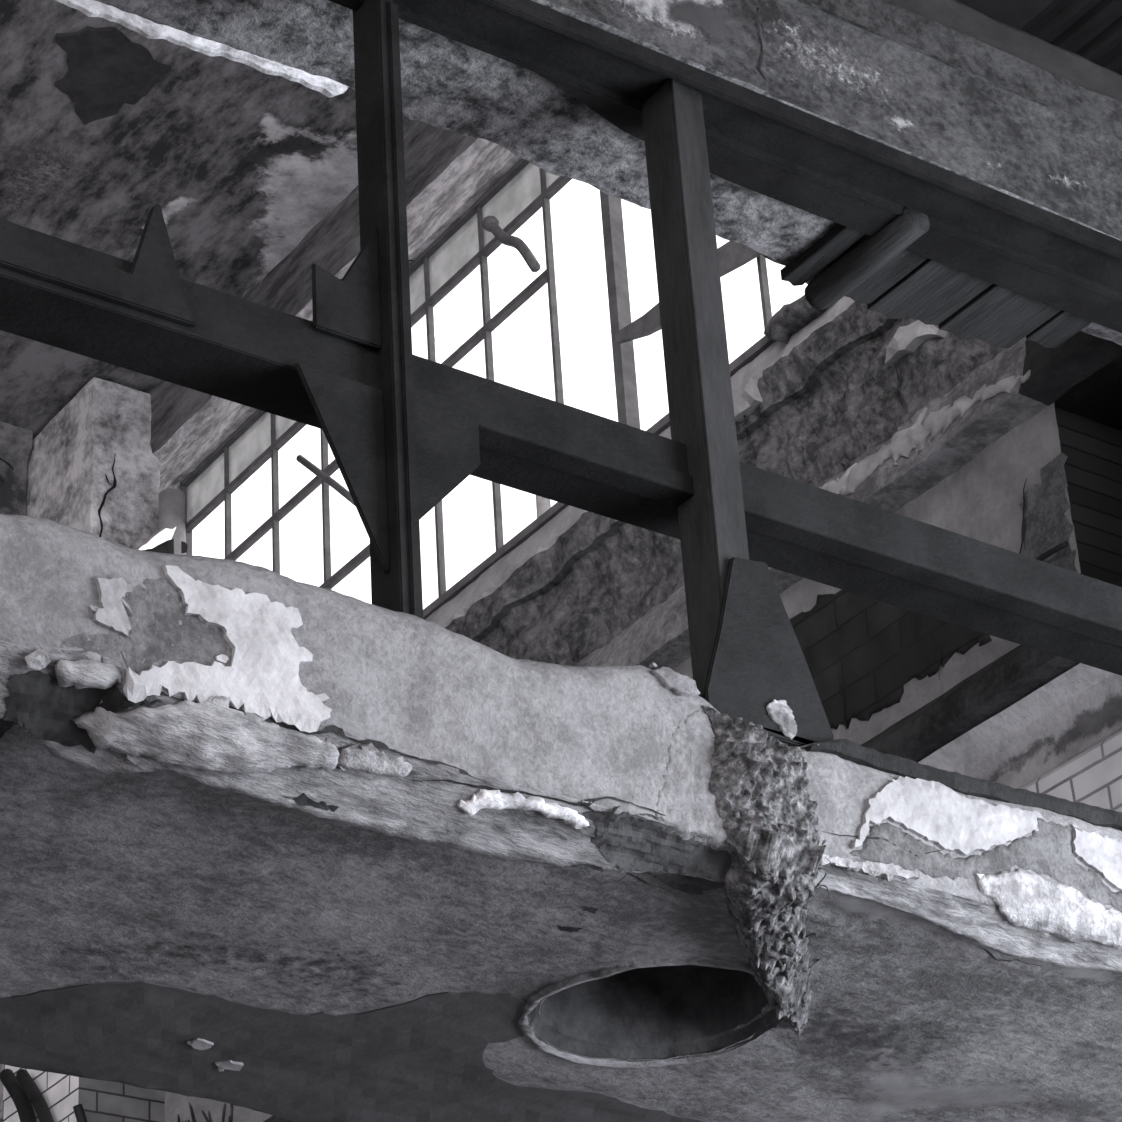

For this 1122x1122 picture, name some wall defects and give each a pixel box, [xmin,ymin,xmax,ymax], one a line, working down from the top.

flaking render [55,0,348,125]
crack [98,453,117,537]
spalling [732,378,762,422]
spalling [764,295,838,344]
spalling [885,320,947,366]
spalling [821,370,1031,496]
peeling [0,565,413,777]
flaking render [457,789,732,895]
flaking render [822,776,1122,950]
flaking render [0,981,707,1122]